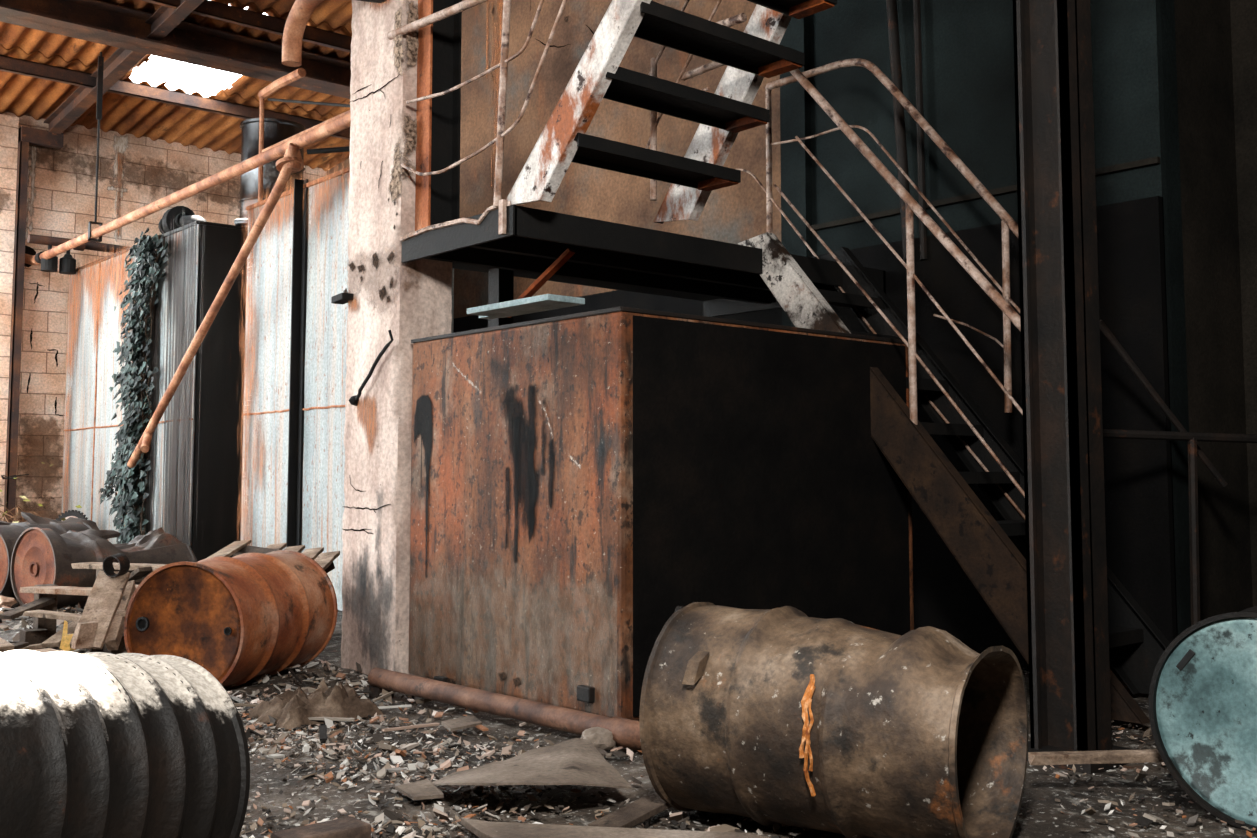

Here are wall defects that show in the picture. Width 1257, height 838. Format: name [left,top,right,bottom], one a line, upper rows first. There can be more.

rust [246,165,350,234]
rust [66,250,132,374]
rust [241,248,263,540]
damp [505,385,545,562]